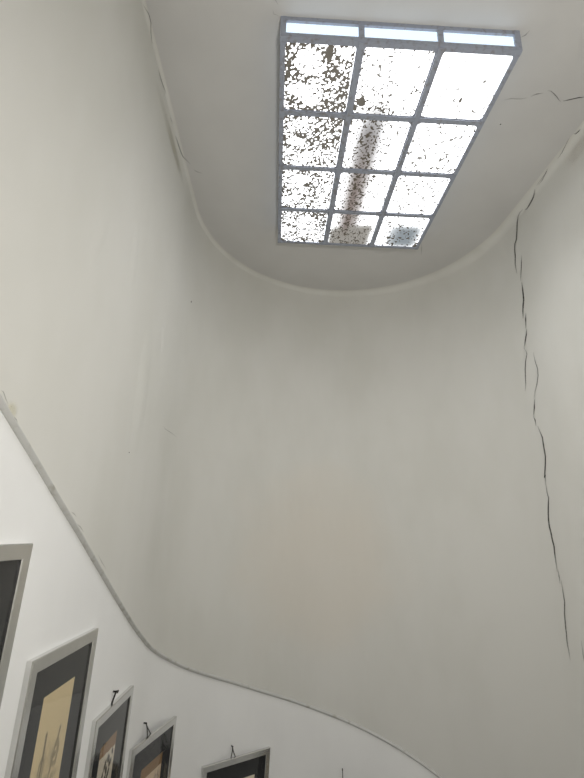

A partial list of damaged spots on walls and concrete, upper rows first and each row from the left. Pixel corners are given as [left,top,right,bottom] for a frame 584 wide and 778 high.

crack [514,193,556,558]
crack [559,577,568,646]